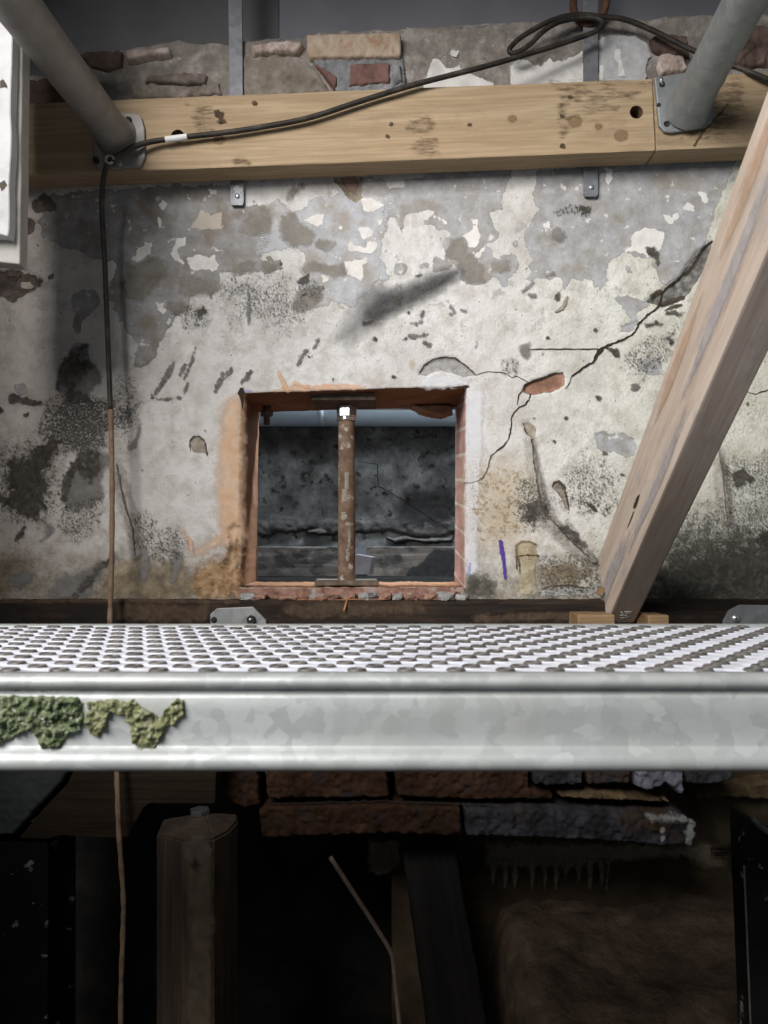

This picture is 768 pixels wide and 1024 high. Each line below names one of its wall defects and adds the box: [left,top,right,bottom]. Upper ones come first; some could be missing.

flaking render [80,47,172,73]
flaking render [145,72,208,87]
spalling [251,33,406,91]
peeling [28,161,736,368]
crack [530,241,713,389]
spalling [419,356,565,395]
water stain [0,344,140,542]
spalling [189,436,208,456]
crack [464,391,531,483]
water stain [52,514,192,599]
corrosion [183,400,243,599]
water stain [648,457,768,599]